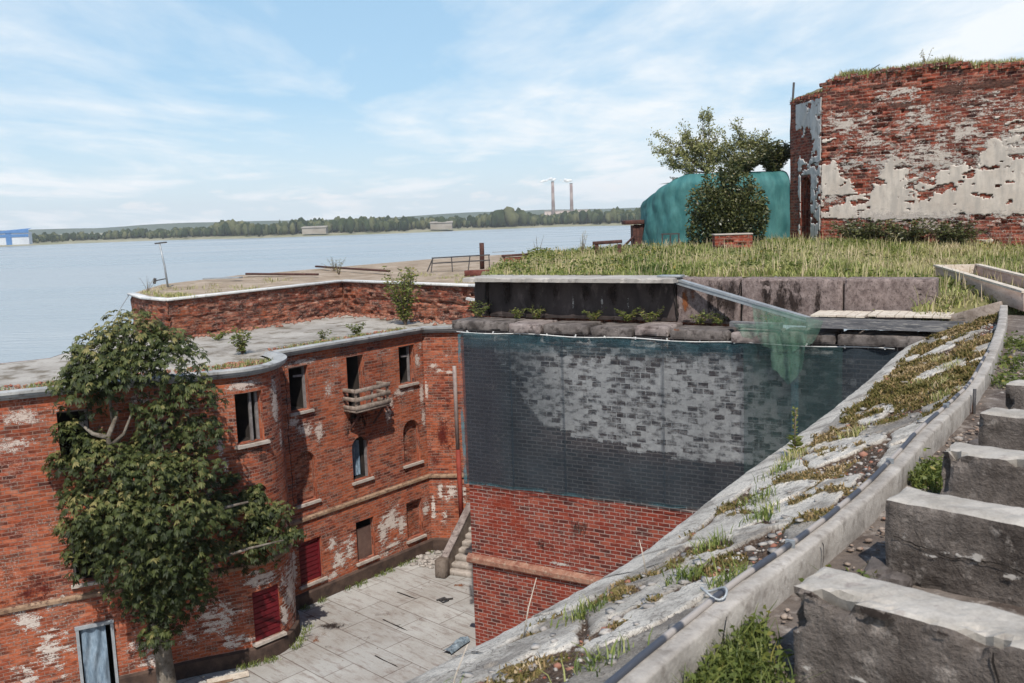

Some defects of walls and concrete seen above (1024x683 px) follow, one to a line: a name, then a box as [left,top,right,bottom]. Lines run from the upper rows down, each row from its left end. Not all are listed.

peeling [795,75,1024,245]
peeling [320,534,356,583]
peeling [377,504,407,559]
peeling [7,593,77,683]
peeling [125,635,155,669]
peeling [173,549,297,661]